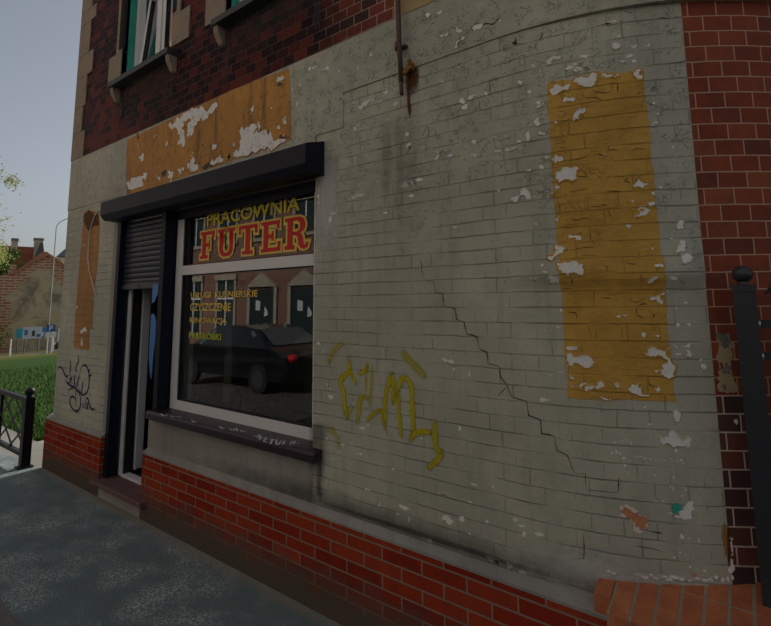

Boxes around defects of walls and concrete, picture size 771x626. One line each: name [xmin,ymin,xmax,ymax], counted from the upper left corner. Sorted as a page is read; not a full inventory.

corrosion [406,68,418,114]
peeling [495,18,650,152]
peeling [126,101,289,190]
spalling [84,210,99,231]
peeling [527,153,581,198]
crack [557,141,645,221]
peeling [626,178,663,228]
peeling [529,232,585,285]
crack [420,259,619,493]
peeling [550,344,660,409]
peeling [642,333,707,381]
spalling [620,504,648,534]